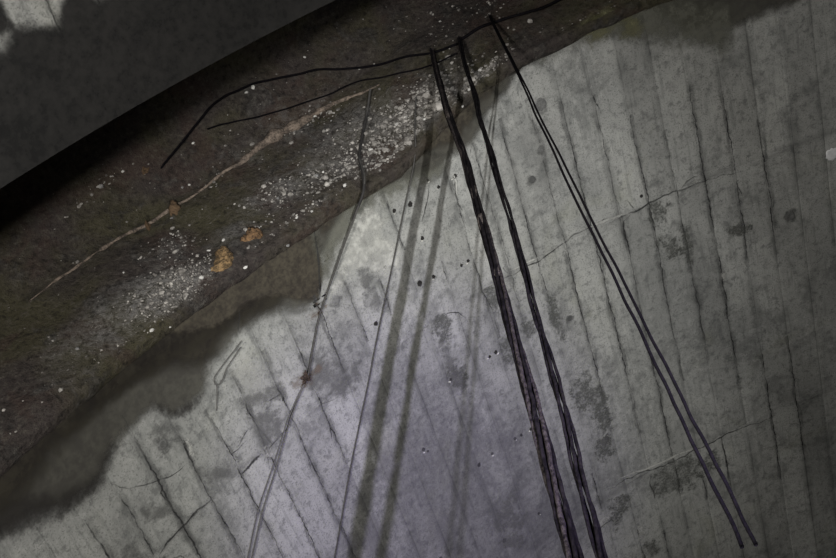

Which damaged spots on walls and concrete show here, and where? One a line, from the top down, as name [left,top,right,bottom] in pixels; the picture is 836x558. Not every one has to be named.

damp [580,0,797,49]
damp [0,0,335,189]
damp [313,75,510,292]
crack [575,174,731,246]
damp [0,295,281,534]
crack [614,415,775,498]
crack [161,503,207,552]